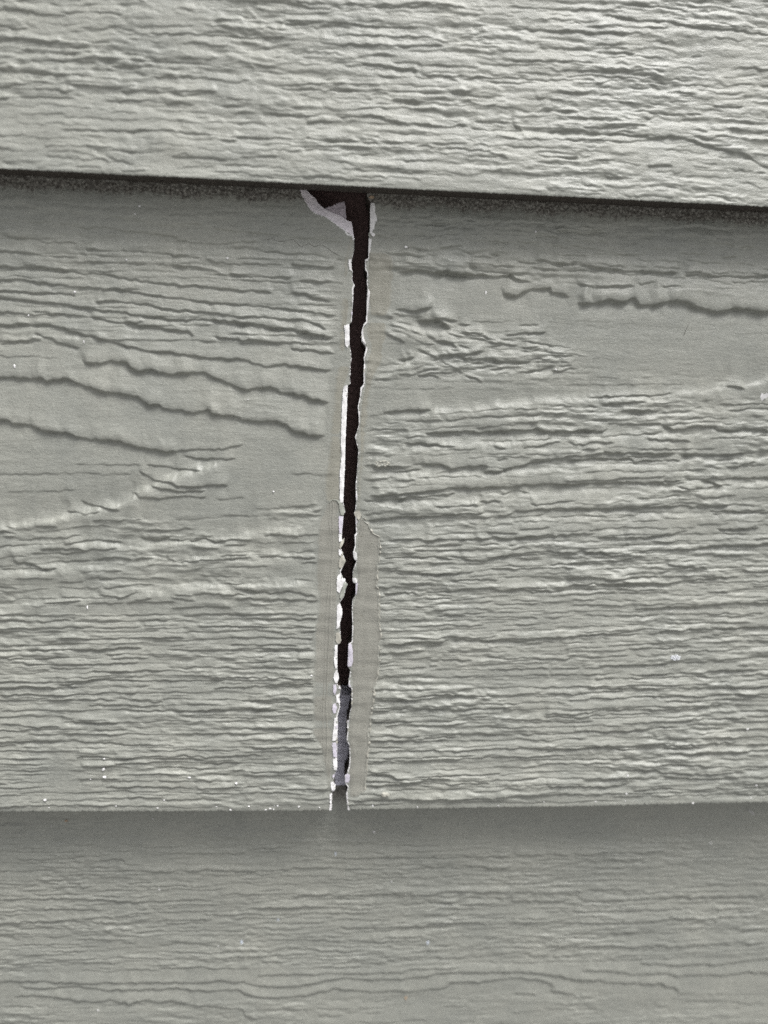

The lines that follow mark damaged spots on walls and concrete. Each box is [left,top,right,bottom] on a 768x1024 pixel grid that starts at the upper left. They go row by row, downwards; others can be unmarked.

crack [268,190,369,677]
spalling [300,190,355,241]
peeling [329,202,377,810]